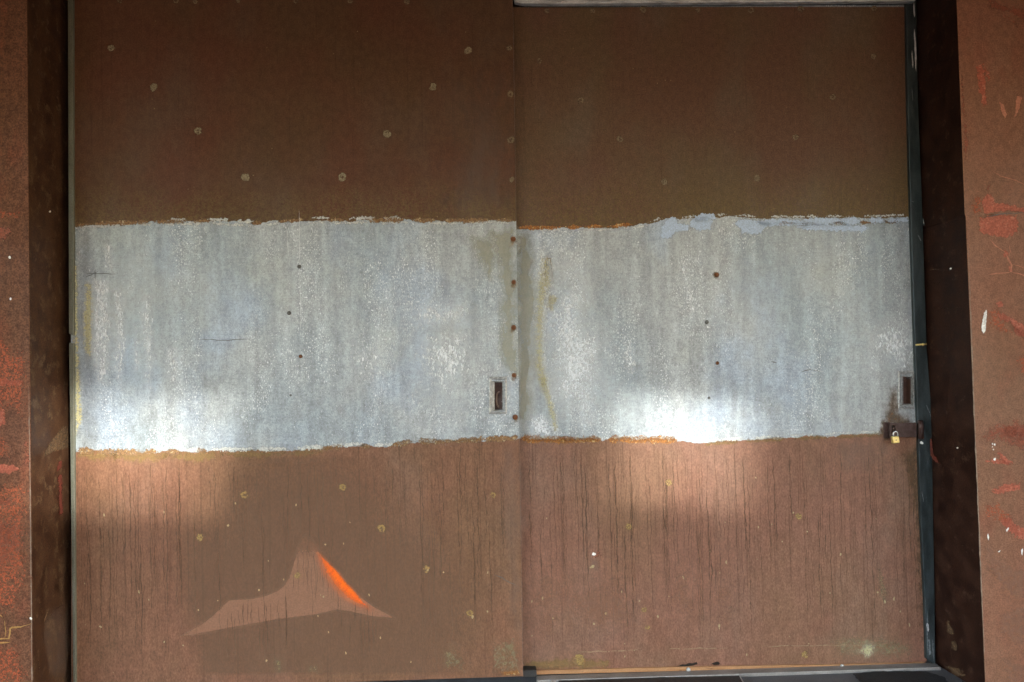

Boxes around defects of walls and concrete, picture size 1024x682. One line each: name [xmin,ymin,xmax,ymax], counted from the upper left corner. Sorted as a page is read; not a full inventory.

peeling [165,218,279,227]
peeling [308,216,408,225]
rust [367,216,632,238]
peeling [580,213,909,239]
rust [391,246,677,447]
rust [706,393,909,445]
peeling [184,442,393,452]
peeling [573,435,742,443]